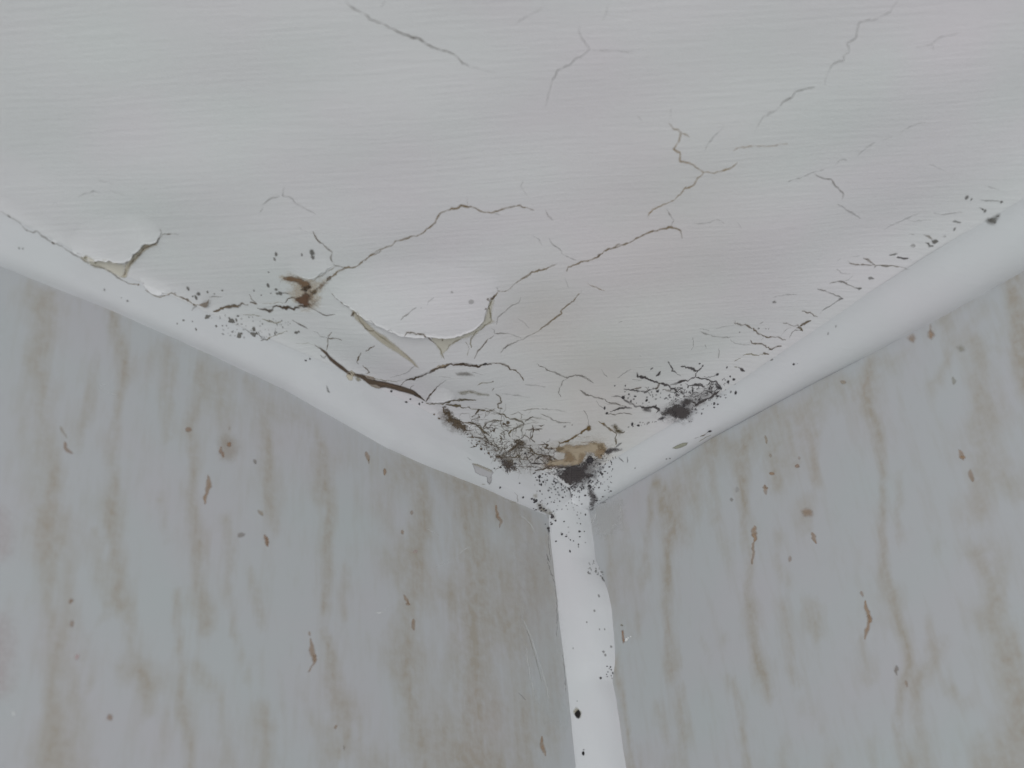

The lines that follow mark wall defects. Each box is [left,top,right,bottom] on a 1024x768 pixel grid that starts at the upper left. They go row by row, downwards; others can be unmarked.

crack [386,25,468,66]
peeling [67,214,172,296]
crack [137,205,532,374]
peeling [351,310,416,366]
crack [401,128,788,409]
water stain [604,362,737,427]
crack [735,238,938,372]
water stain [433,406,628,552]